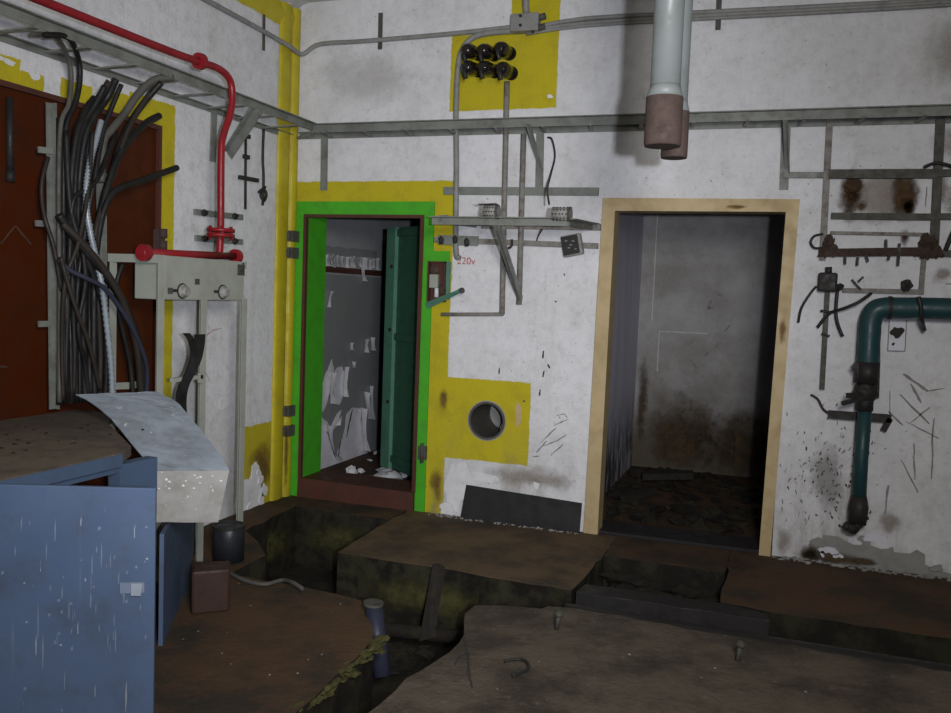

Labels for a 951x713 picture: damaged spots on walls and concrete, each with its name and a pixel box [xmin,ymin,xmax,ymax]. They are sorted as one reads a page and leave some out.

rust [842,179,865,213]
rust [893,179,917,213]
peeling [321,337,377,469]
damp [638,375,647,431]
damp [656,408,768,471]
peeling [235,462,268,511]
damp [505,473,560,485]
flaking render [802,533,951,578]